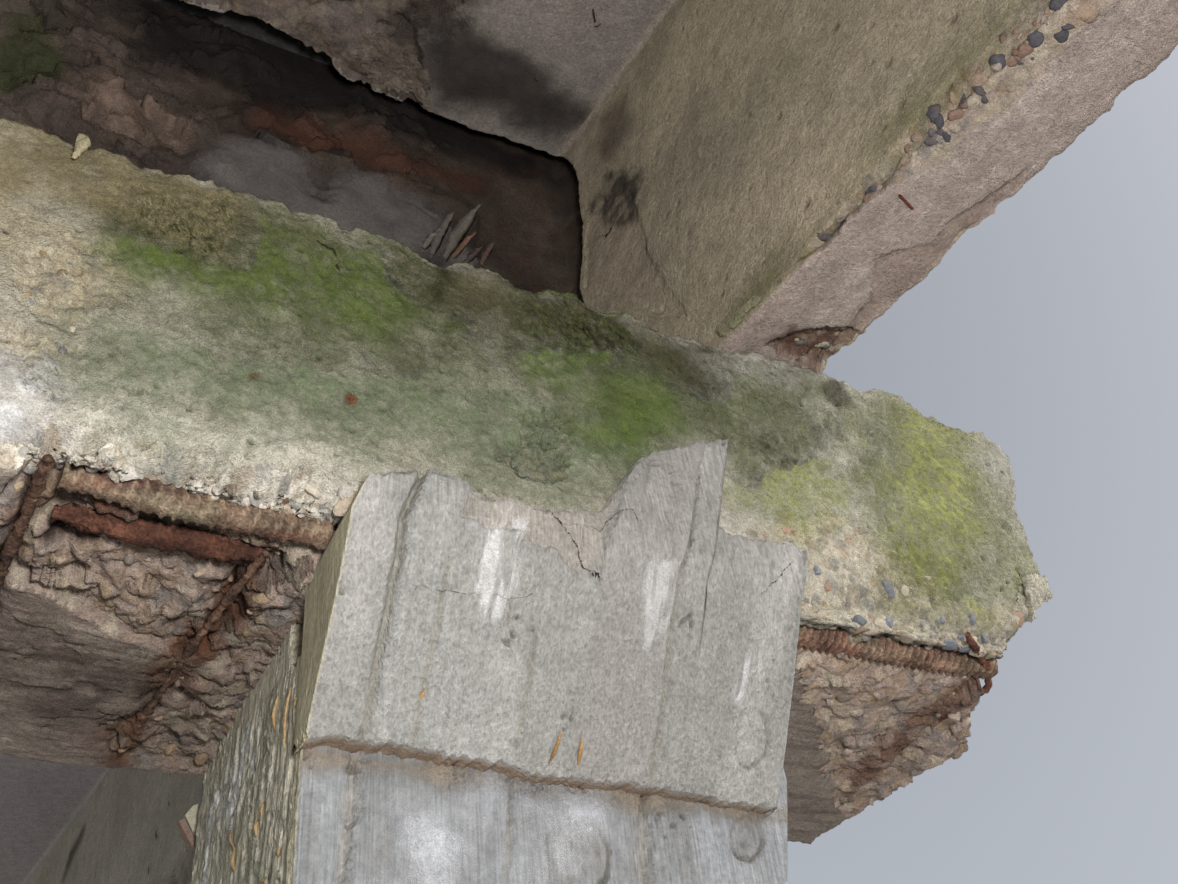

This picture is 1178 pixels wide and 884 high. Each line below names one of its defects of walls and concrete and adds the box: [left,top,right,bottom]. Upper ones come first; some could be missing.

spalling [184,0,465,109]
leakage [139,0,533,174]
leakage [407,0,588,131]
leakage [592,172,638,225]
spalling [0,226,129,367]
corrosion [88,494,141,519]
spalling [0,423,361,775]
corrosion [134,562,252,694]
spalling [746,507,1053,819]